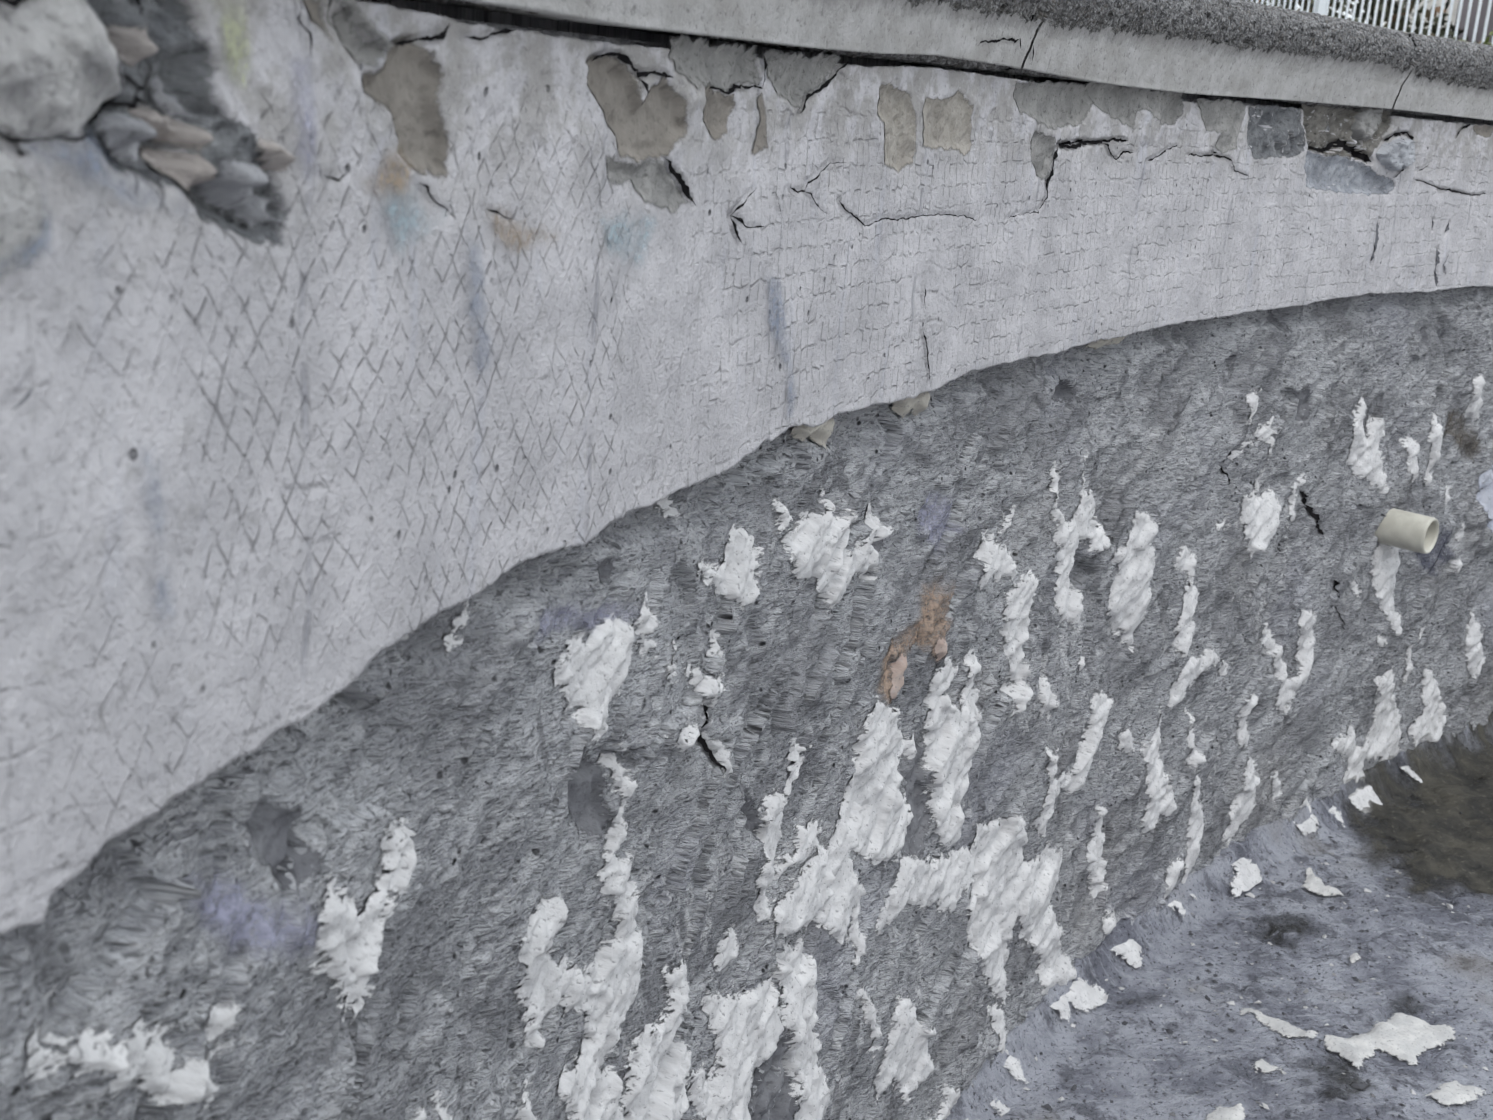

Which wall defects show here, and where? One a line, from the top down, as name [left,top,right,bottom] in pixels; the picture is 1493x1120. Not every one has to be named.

crack [393,24,516,46]
crack [592,52,673,98]
crack [665,158,695,204]
spalling [586,34,840,213]
crack [730,138,1248,245]
crack [1308,131,1487,286]
corrosion [881,586,952,699]
peeling [1294,544,1448,836]
peeling [513,455,1228,1120]
leakage [1347,711,1493,895]
peeling [246,790,417,1025]
peeling [25,1000,242,1113]